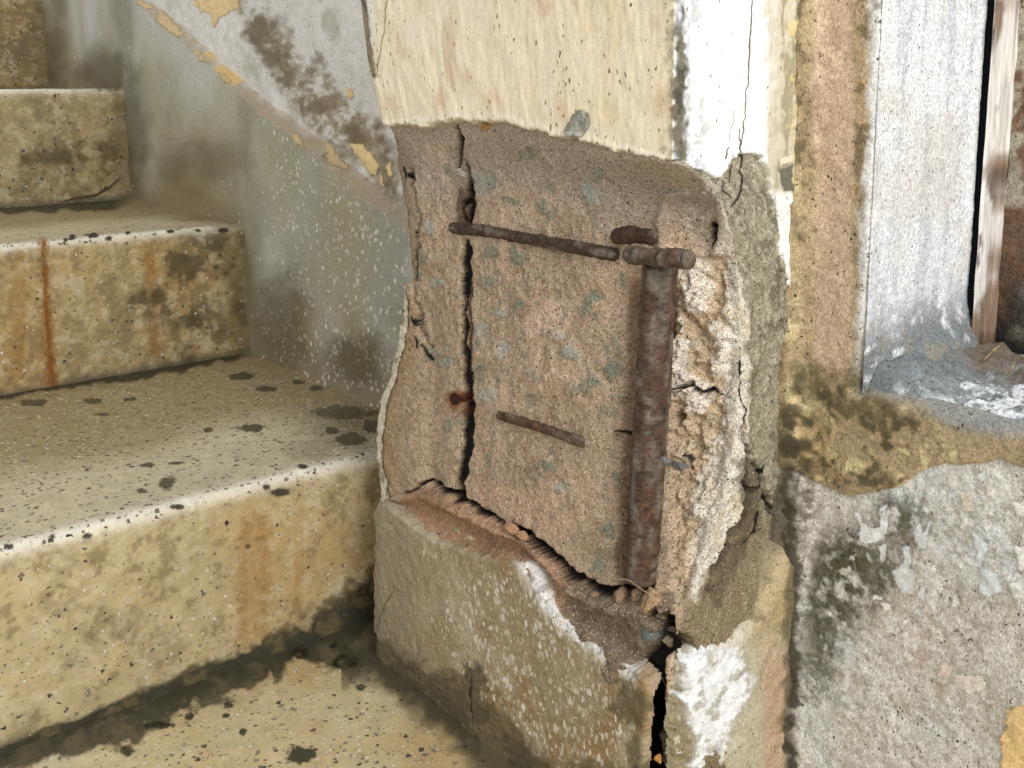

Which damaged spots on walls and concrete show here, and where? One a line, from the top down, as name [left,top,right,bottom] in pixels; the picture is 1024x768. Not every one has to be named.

peeling [194,0,241,27]
leakage [243,15,396,196]
spalling [361,0,376,77]
crack [712,0,753,248]
rust [41,240,57,385]
rust [449,392,476,417]
crack [410,132,685,768]
spalling [350,110,795,768]
crack [672,347,747,423]
leakage [794,368,920,451]
leakage [0,567,549,768]
leakage [780,414,893,768]